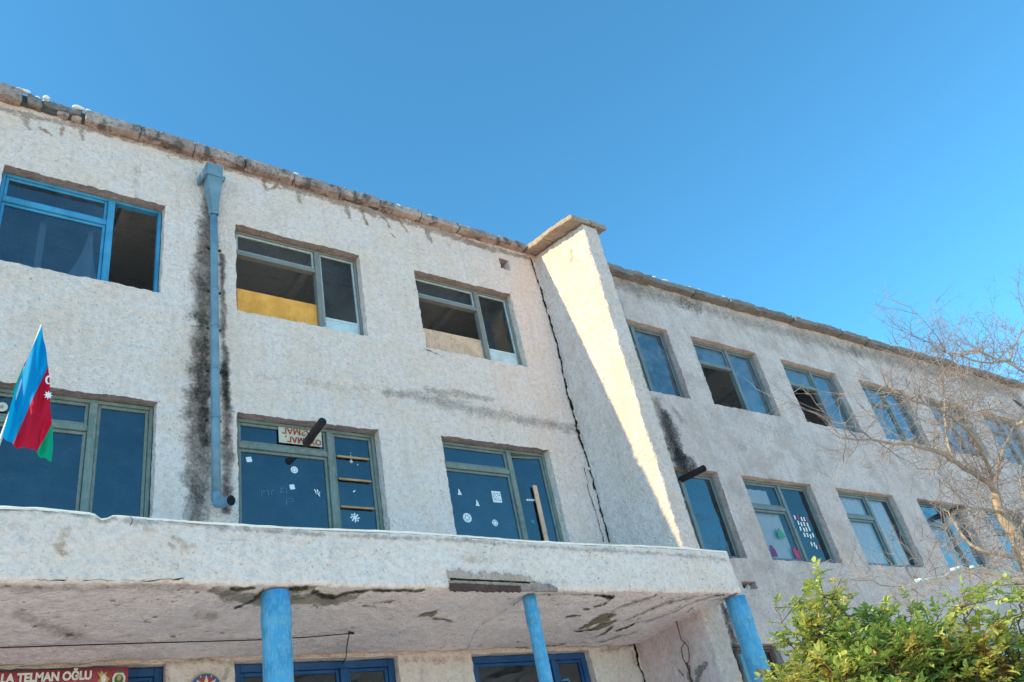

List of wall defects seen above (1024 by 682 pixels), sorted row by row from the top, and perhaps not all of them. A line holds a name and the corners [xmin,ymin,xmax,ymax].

damp [186,198,234,521]
crack [530,257,610,542]
damp [661,409,696,473]
spalling [210,588,261,606]
spalling [288,586,392,607]
spalling [447,567,558,593]
spalling [566,594,727,644]